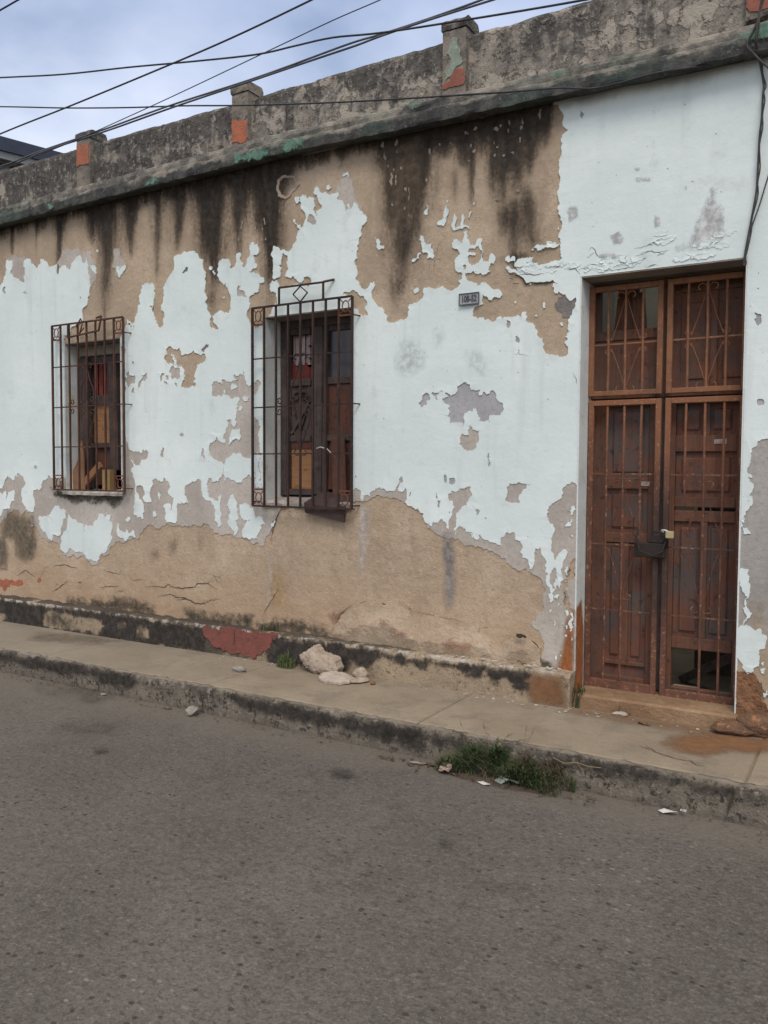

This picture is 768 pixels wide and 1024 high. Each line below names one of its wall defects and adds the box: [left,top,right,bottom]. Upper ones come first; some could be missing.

damp [0,103,552,273]
peeling [0,102,676,357]
peeling [673,230,736,262]
peeling [125,349,147,393]
peeling [160,344,208,388]
damp [0,513,35,565]
flaking render [0,374,577,671]
crack [2,564,220,604]
peeling [736,439,768,716]
damp [0,599,204,651]